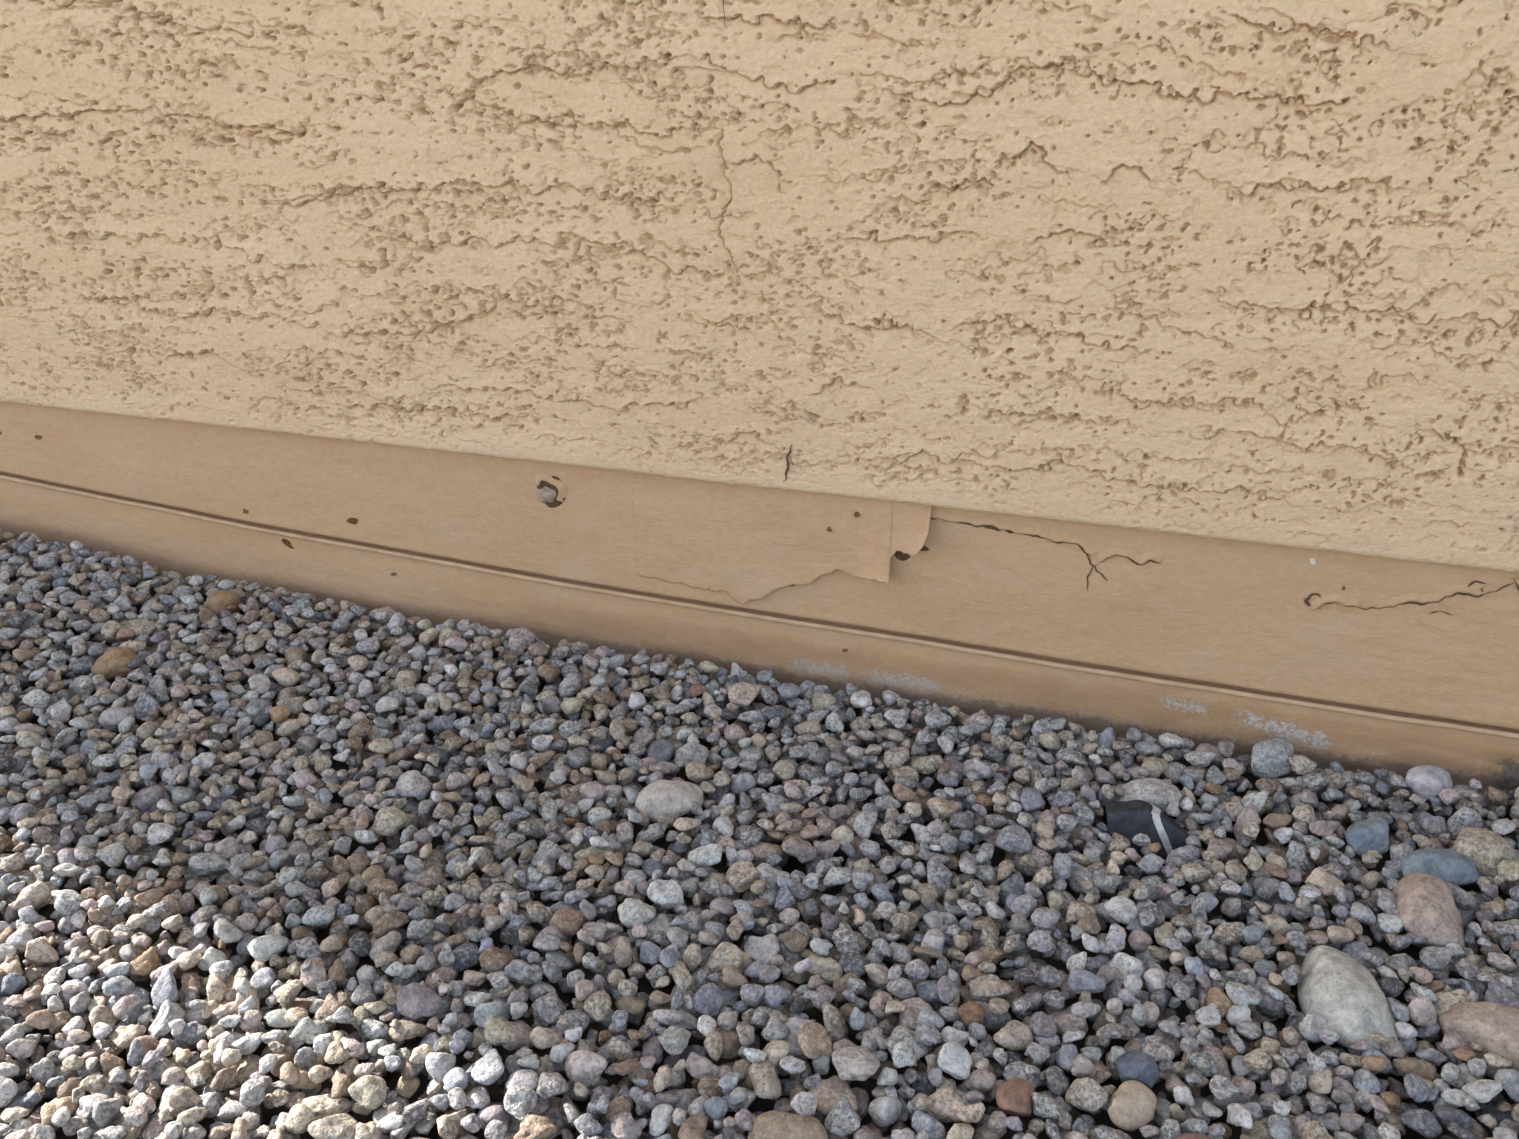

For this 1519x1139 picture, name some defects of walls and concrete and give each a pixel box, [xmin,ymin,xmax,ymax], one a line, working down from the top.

peeling [631,473,932,605]
crack [930,509,1163,591]
crack [1304,578,1519,615]